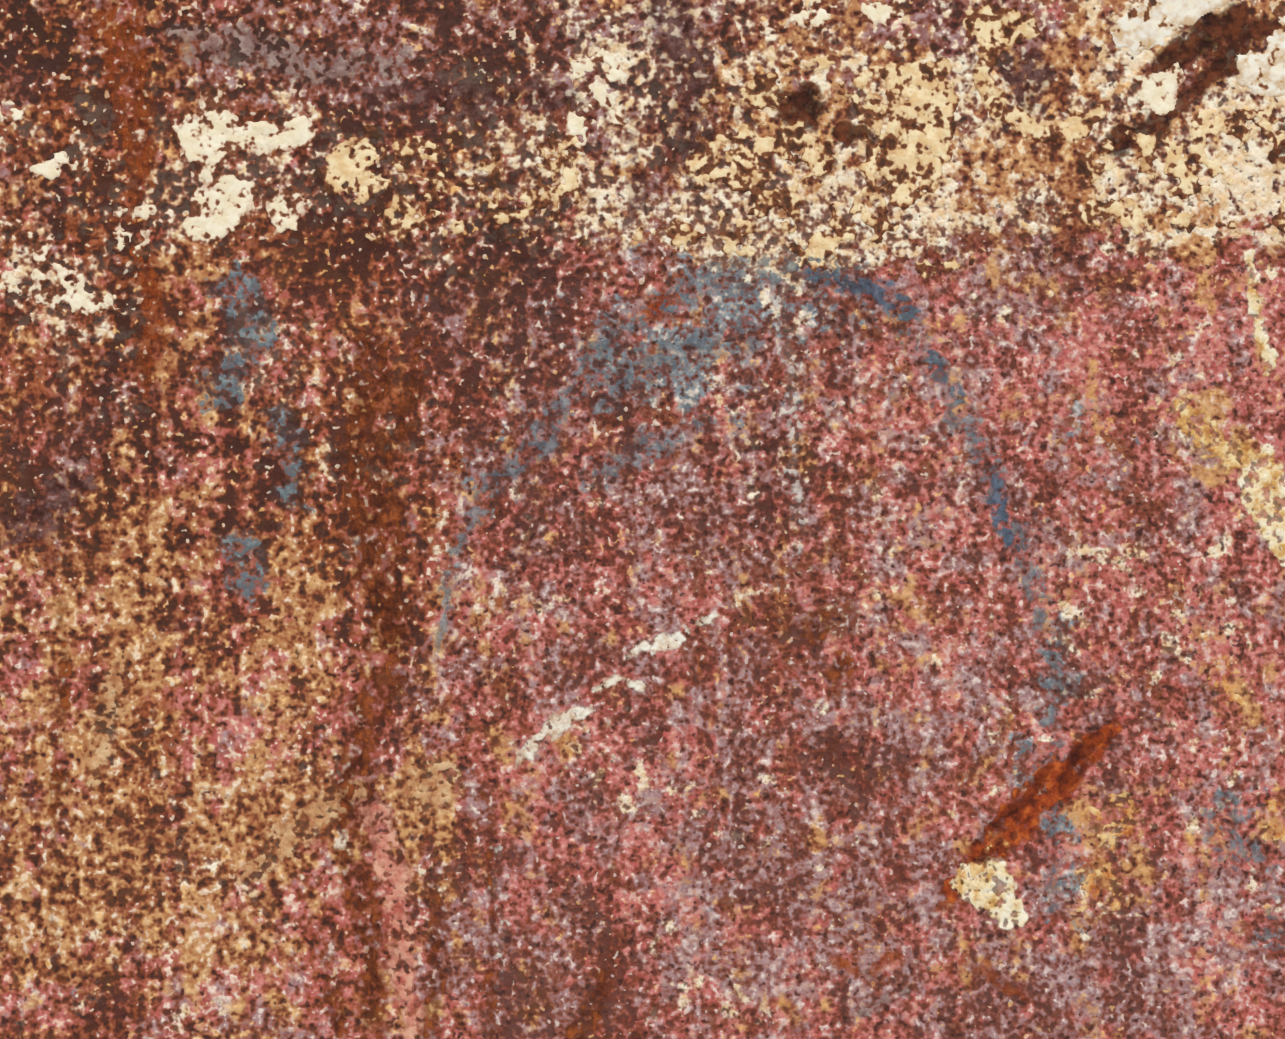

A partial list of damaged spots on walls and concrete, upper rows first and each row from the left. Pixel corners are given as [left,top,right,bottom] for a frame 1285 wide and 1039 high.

peeling [171,84,319,244]
peeling [312,47,629,246]
peeling [632,0,959,272]
peeling [887,245,986,280]
peeling [963,0,1285,239]
rust [939,718,1142,918]